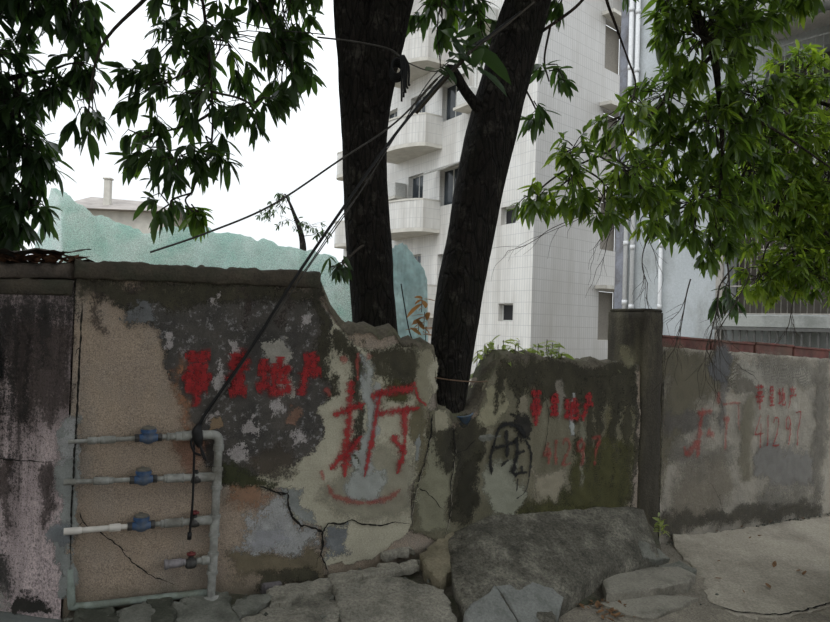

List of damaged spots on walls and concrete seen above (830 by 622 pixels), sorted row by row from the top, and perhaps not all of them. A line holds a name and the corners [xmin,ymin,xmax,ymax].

damp [0,549,15,613]
crack [0,304,177,586]
damp [0,278,487,536]
damp [225,532,326,591]
crack [260,414,476,573]
damp [516,495,588,514]
damp [492,355,642,507]